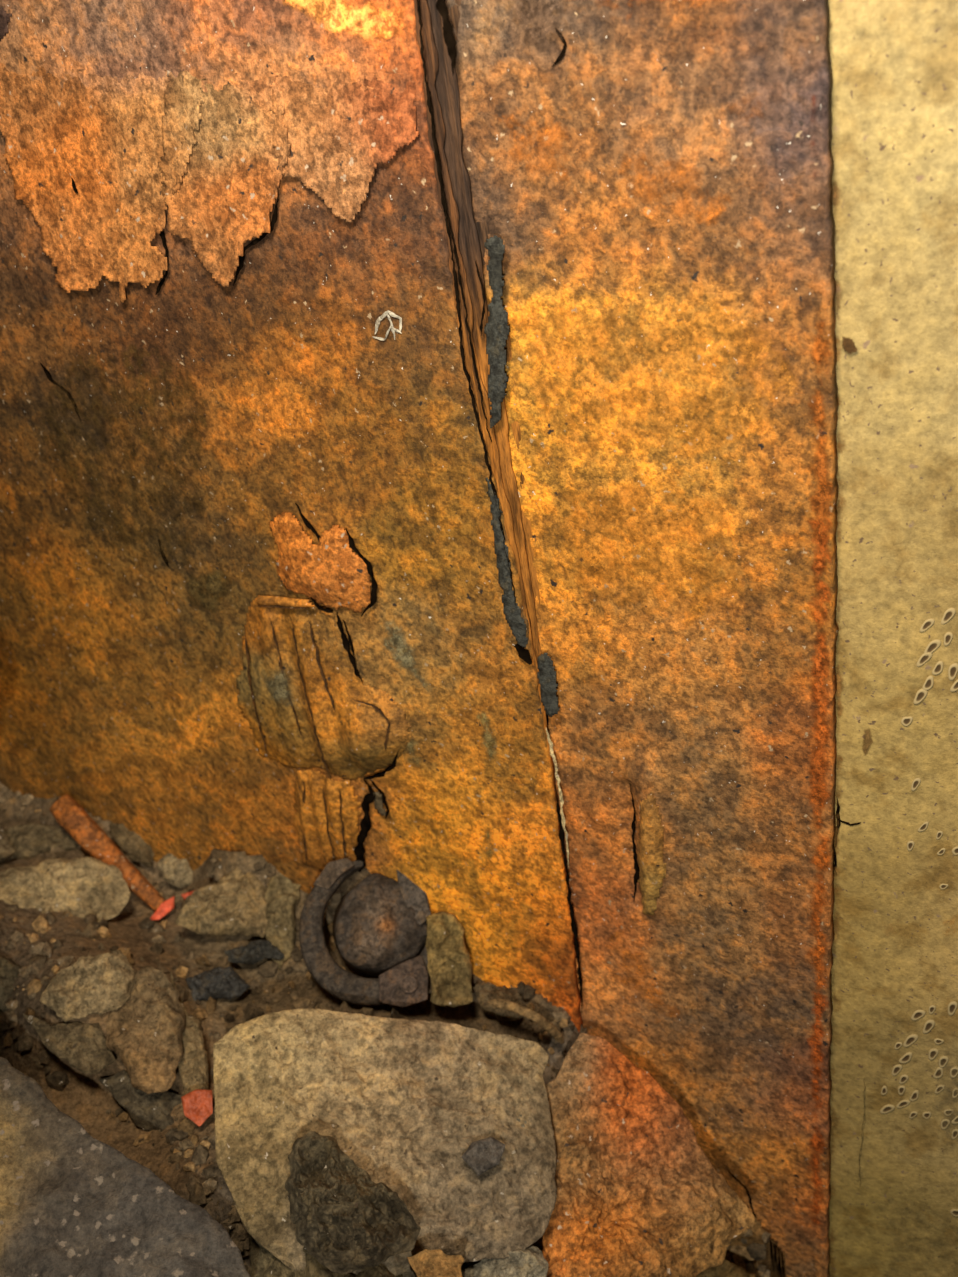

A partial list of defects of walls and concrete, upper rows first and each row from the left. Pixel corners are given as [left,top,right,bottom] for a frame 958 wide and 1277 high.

rust [0,8,12,41]
rust [284,0,403,39]
peeling [0,62,419,303]
crack [417,0,516,606]
rust [513,305,768,449]
rust [563,489,723,603]
crack [555,787,583,1012]
rust [809,392,843,1224]
rust [542,1033,755,1277]